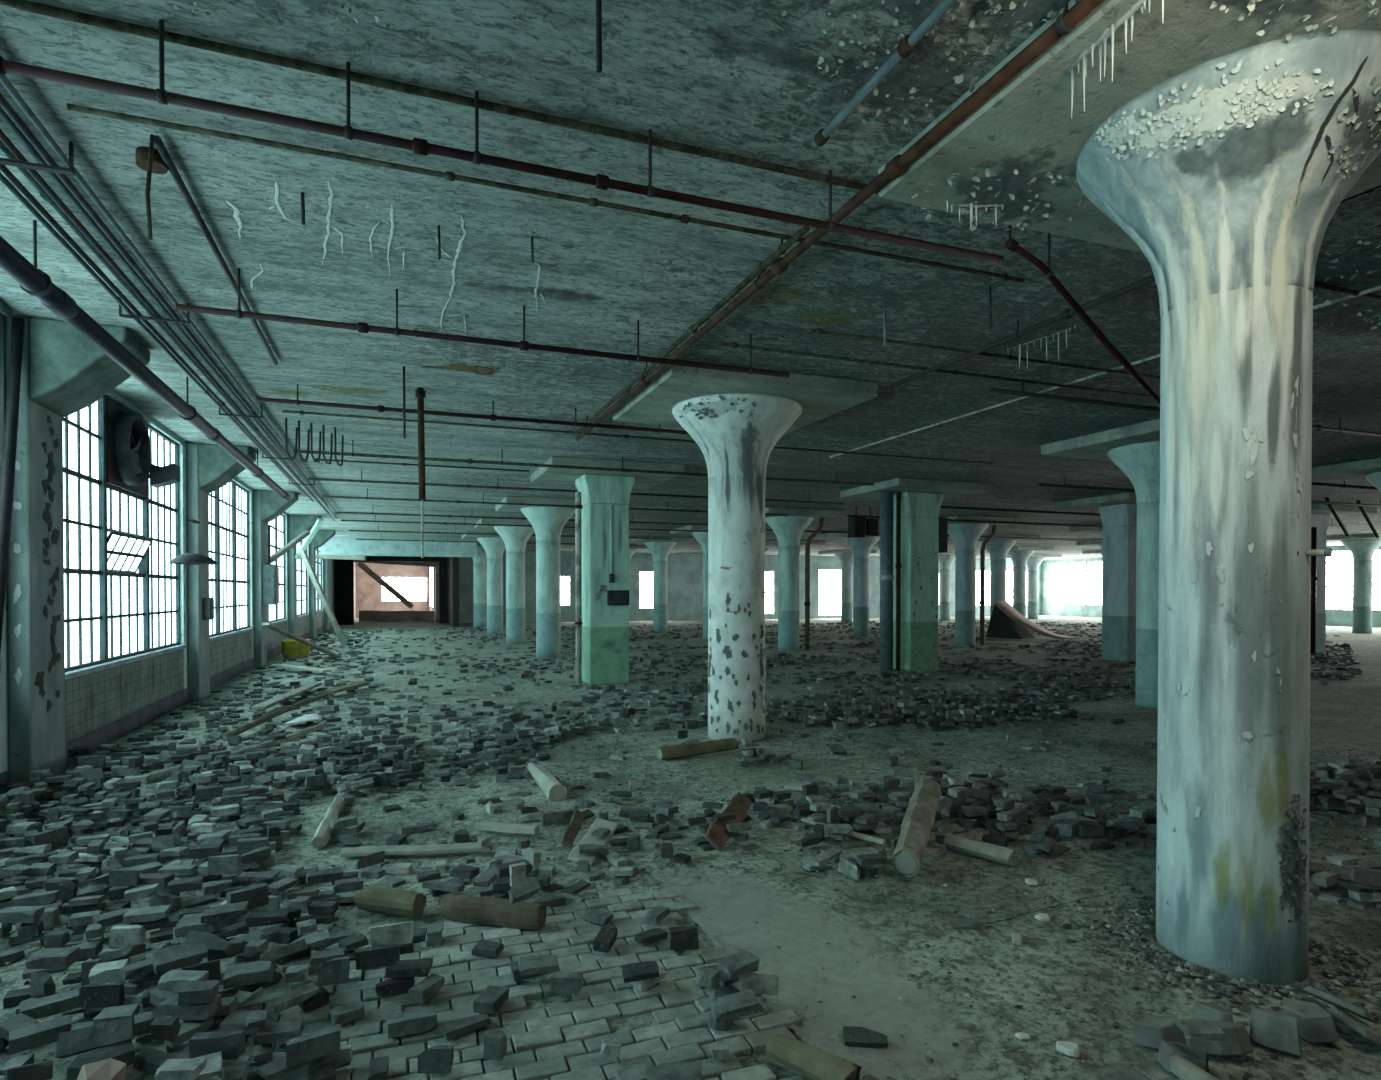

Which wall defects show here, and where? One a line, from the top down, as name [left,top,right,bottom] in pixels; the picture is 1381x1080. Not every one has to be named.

peeling [761,0,1077,127]
peeling [911,148,1091,231]
damp [1071,0,1164,118]
peeling [1094,59,1381,178]
peeling [1210,0,1337,41]
crack [1296,56,1368,205]
damp [1120,170,1381,568]
peeling [708,521,767,736]
spalling [1277,794,1308,935]